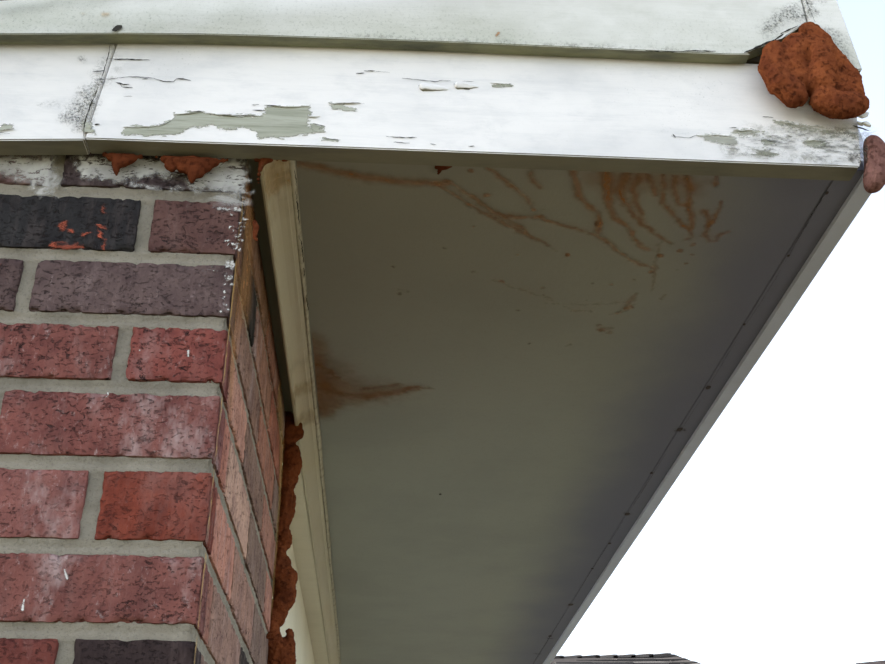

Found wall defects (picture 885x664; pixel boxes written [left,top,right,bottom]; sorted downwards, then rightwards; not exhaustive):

peeling [121,104,339,142]
peeling [328,102,364,112]
peeling [673,116,833,157]
rust [571,171,718,250]